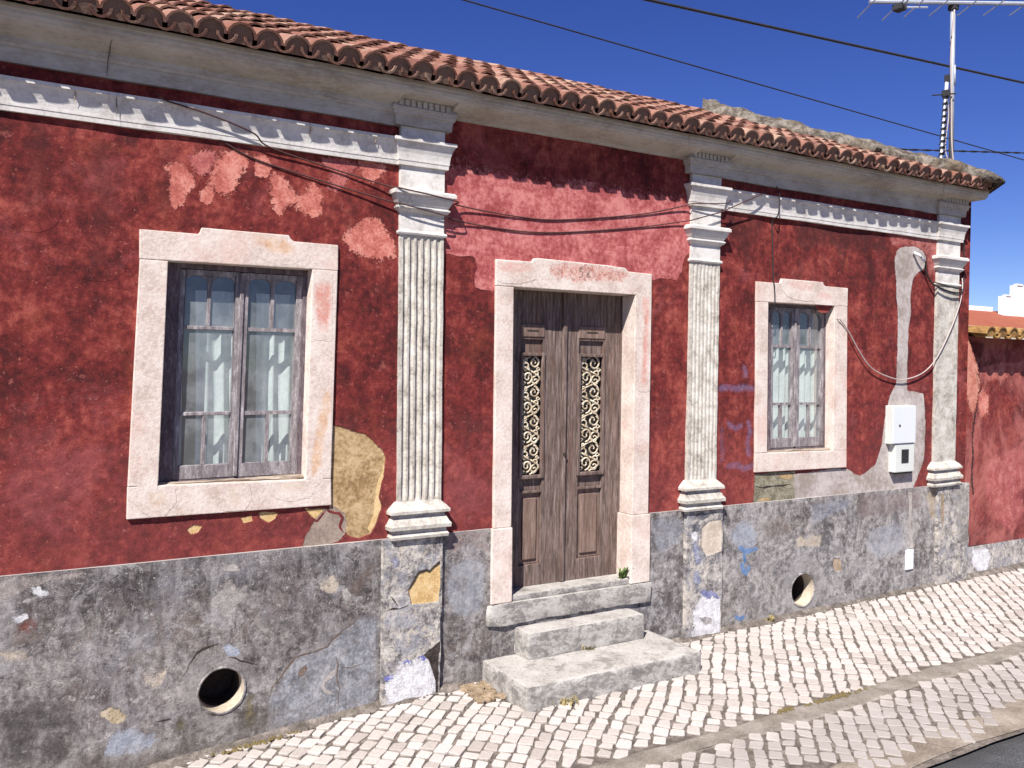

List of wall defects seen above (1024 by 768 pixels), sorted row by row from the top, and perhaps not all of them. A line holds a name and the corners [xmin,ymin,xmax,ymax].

peeling [162,146,387,218]
peeling [342,215,398,263]
peeling [178,516,210,543]
spalling [232,418,392,547]
peeling [650,511,723,637]
peeling [753,471,856,578]
crack [183,617,360,701]
peeling [251,555,491,735]